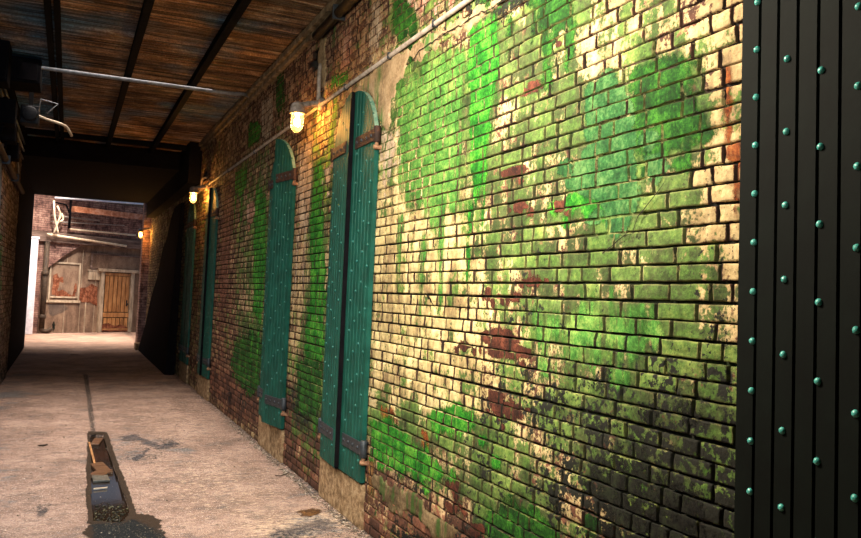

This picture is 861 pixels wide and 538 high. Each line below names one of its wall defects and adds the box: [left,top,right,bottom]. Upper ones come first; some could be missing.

damp [486,0,576,95]
rust [724,66,741,214]
damp [294,142,332,290]
damp [396,214,404,280]
damp [418,233,427,315]
damp [437,223,445,306]
damp [465,168,487,285]
damp [378,520,427,538]
damp [581,438,715,538]